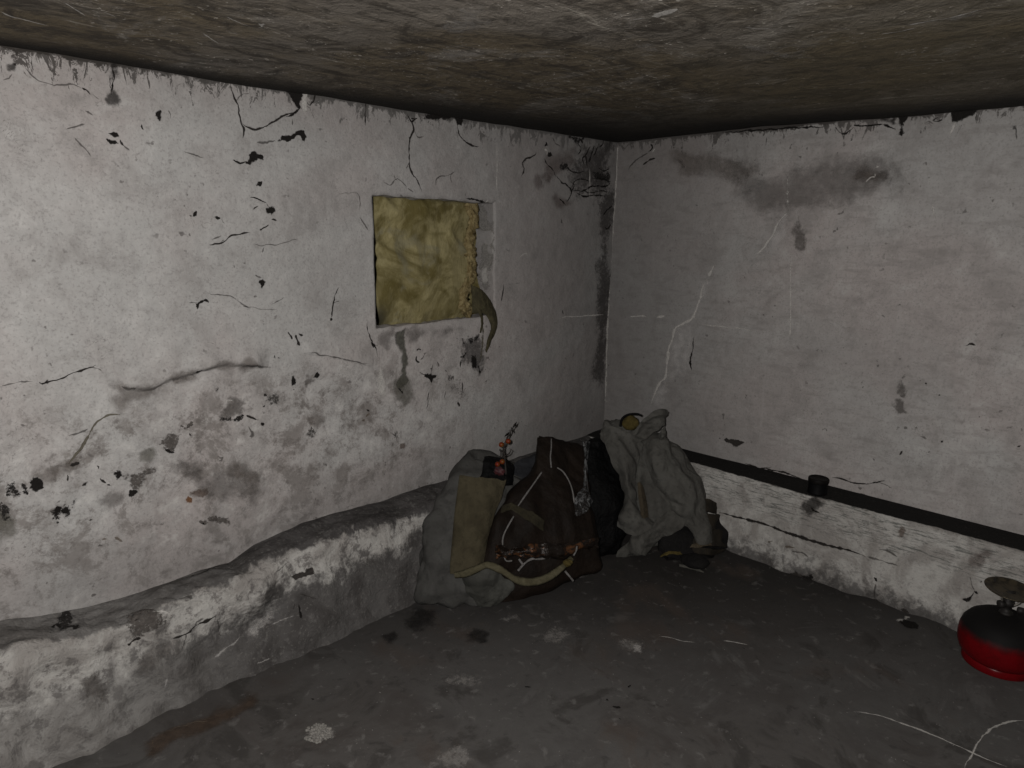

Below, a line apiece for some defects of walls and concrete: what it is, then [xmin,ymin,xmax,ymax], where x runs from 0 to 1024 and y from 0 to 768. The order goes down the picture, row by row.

spalling [234,92,307,165]
crack [231,89,316,137]
crack [391,116,488,203]
leakage [545,135,611,204]
crack [211,232,296,252]
crack [4,365,101,386]
leakage [378,327,484,406]
crack [68,414,120,464]
crack [723,513,896,565]